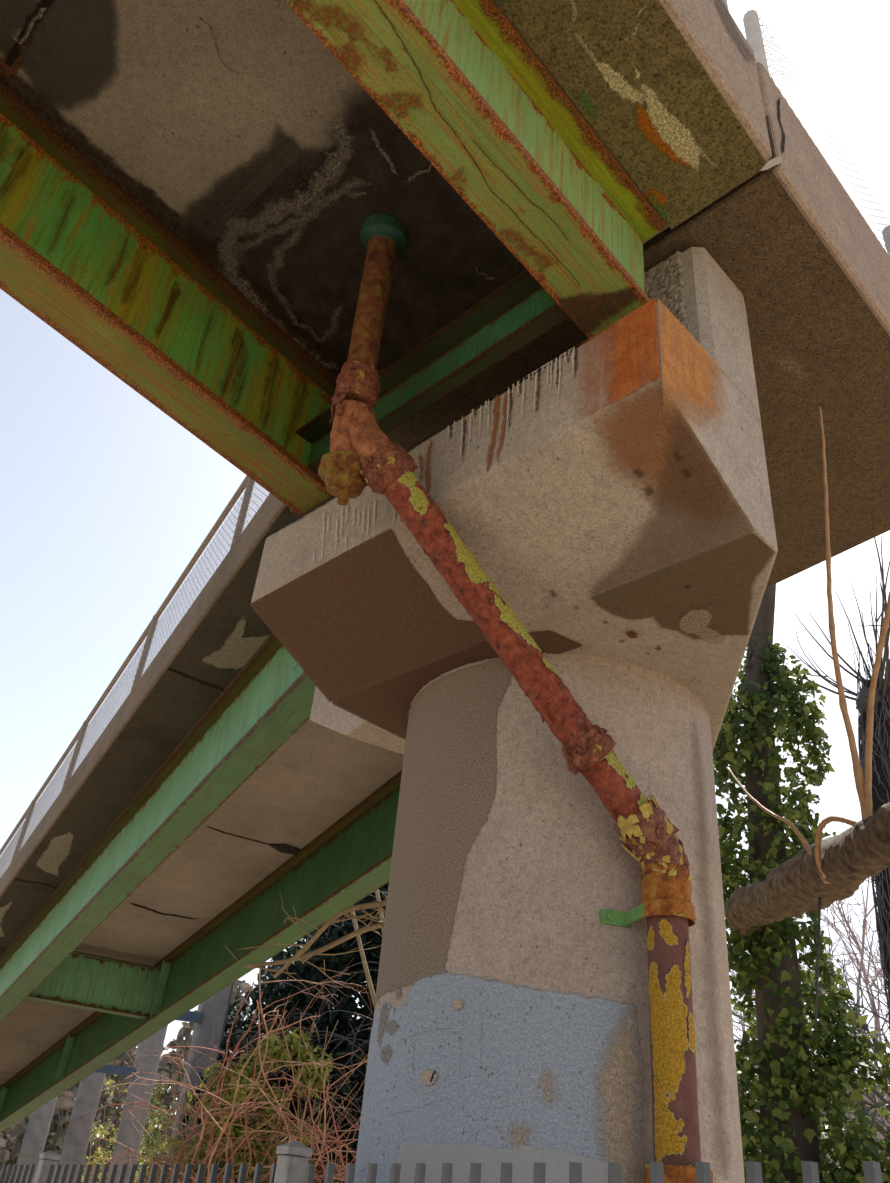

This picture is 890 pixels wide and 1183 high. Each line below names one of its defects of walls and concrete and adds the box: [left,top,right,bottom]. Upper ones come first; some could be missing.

crack [0,0,54,78]
rust [293,0,397,71]
water stain [182,96,526,372]
water stain [447,399,490,459]
rust [487,392,508,471]
water stain [506,345,577,428]
rust [560,288,721,516]
rust [391,439,500,627]
peeling [36,832,74,876]
crack [205,826,301,855]
rust [624,796,690,881]
crack [131,903,197,920]